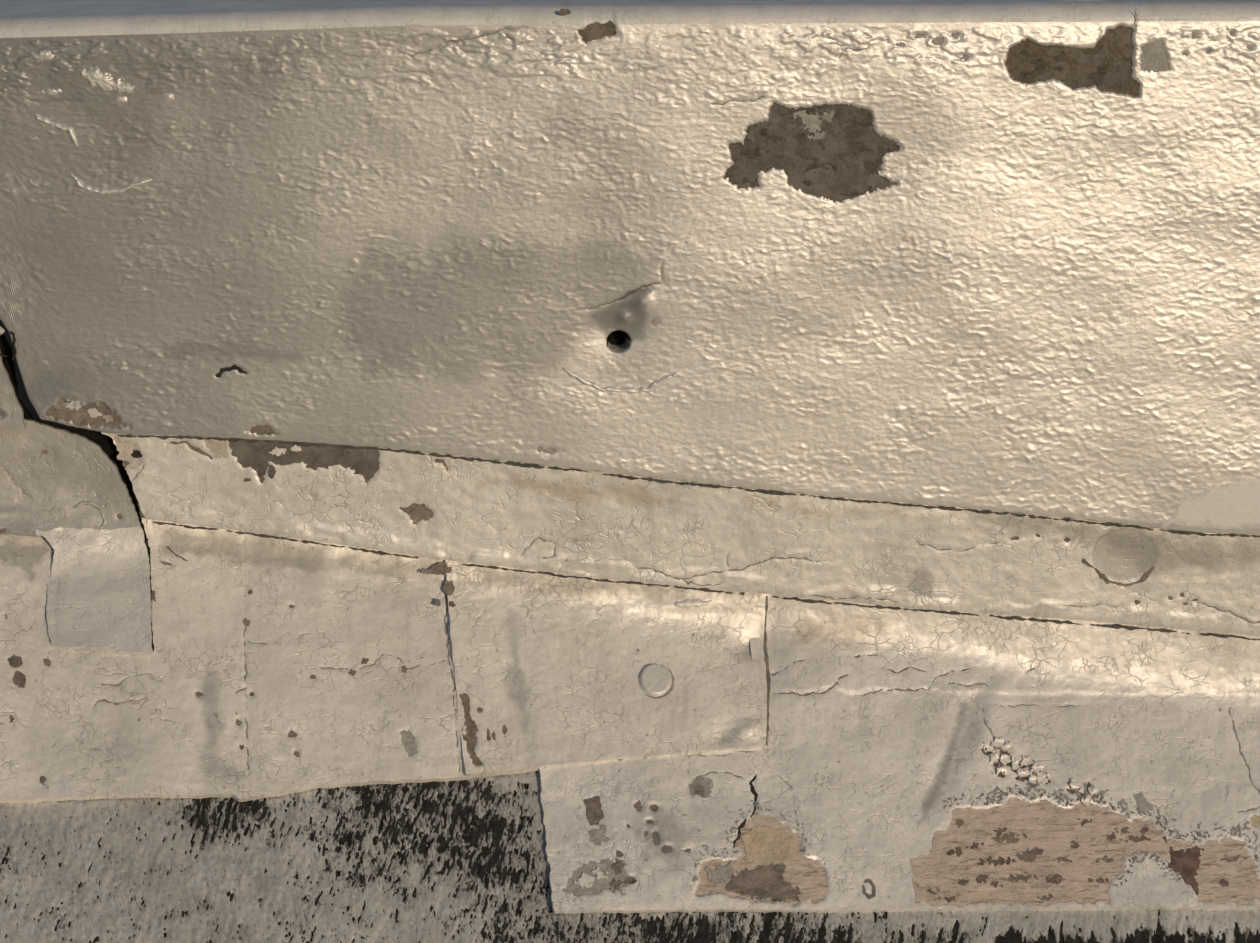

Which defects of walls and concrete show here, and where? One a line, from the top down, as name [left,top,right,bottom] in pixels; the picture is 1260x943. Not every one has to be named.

peeling [578,20,616,44]
peeling [1005,25,1171,97]
peeling [723,102,909,203]
crack [0,331,187,650]
crack [170,441,213,459]
peeling [229,425,380,483]
peeling [459,693,507,766]
peeling [562,796,637,896]
peeling [634,800,829,906]
crack [684,748,796,848]
peeling [910,737,1260,907]